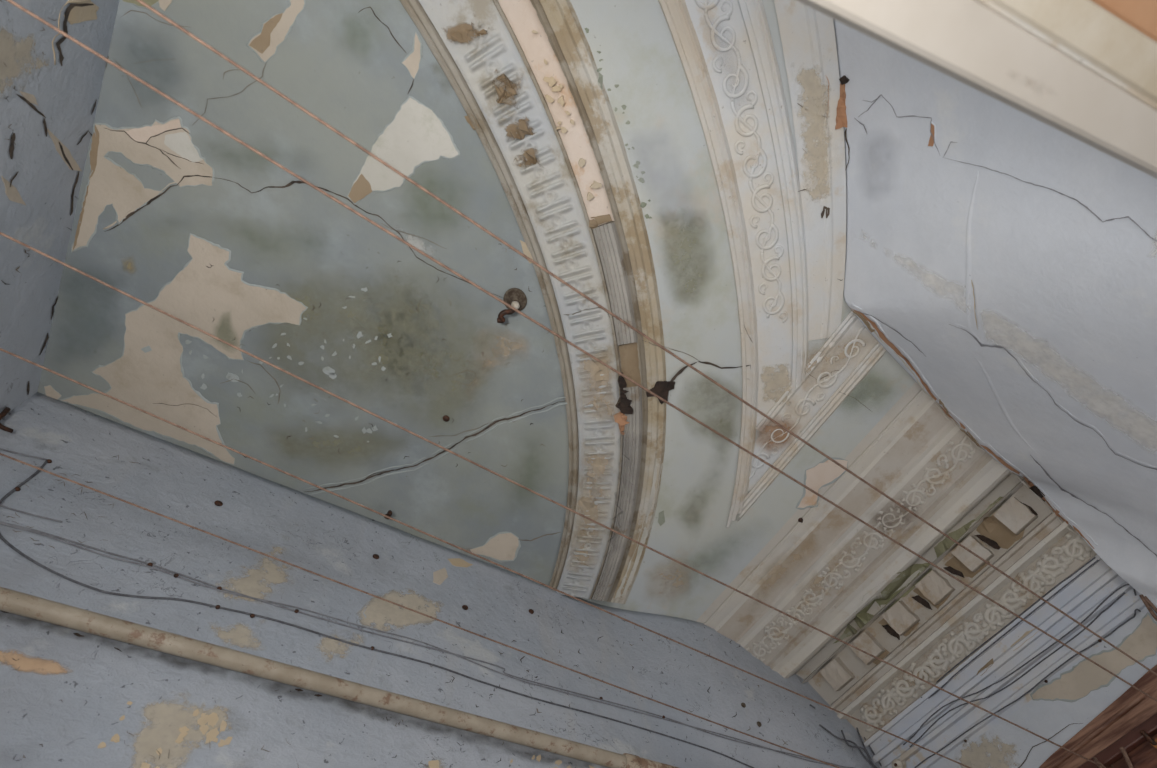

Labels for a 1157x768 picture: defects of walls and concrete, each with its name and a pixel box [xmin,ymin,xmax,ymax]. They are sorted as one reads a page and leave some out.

peeling [67,116,215,253]
peeling [347,96,460,205]
crack [797,76,1157,241]
peeling [44,233,321,465]
crack [303,397,567,495]
crack [857,311,926,357]
crack [949,323,1157,470]
crack [1031,456,1157,557]
peeling [433,532,521,585]
peeling [320,591,439,658]
peeling [1030,612,1157,702]
peeling [98,701,233,768]